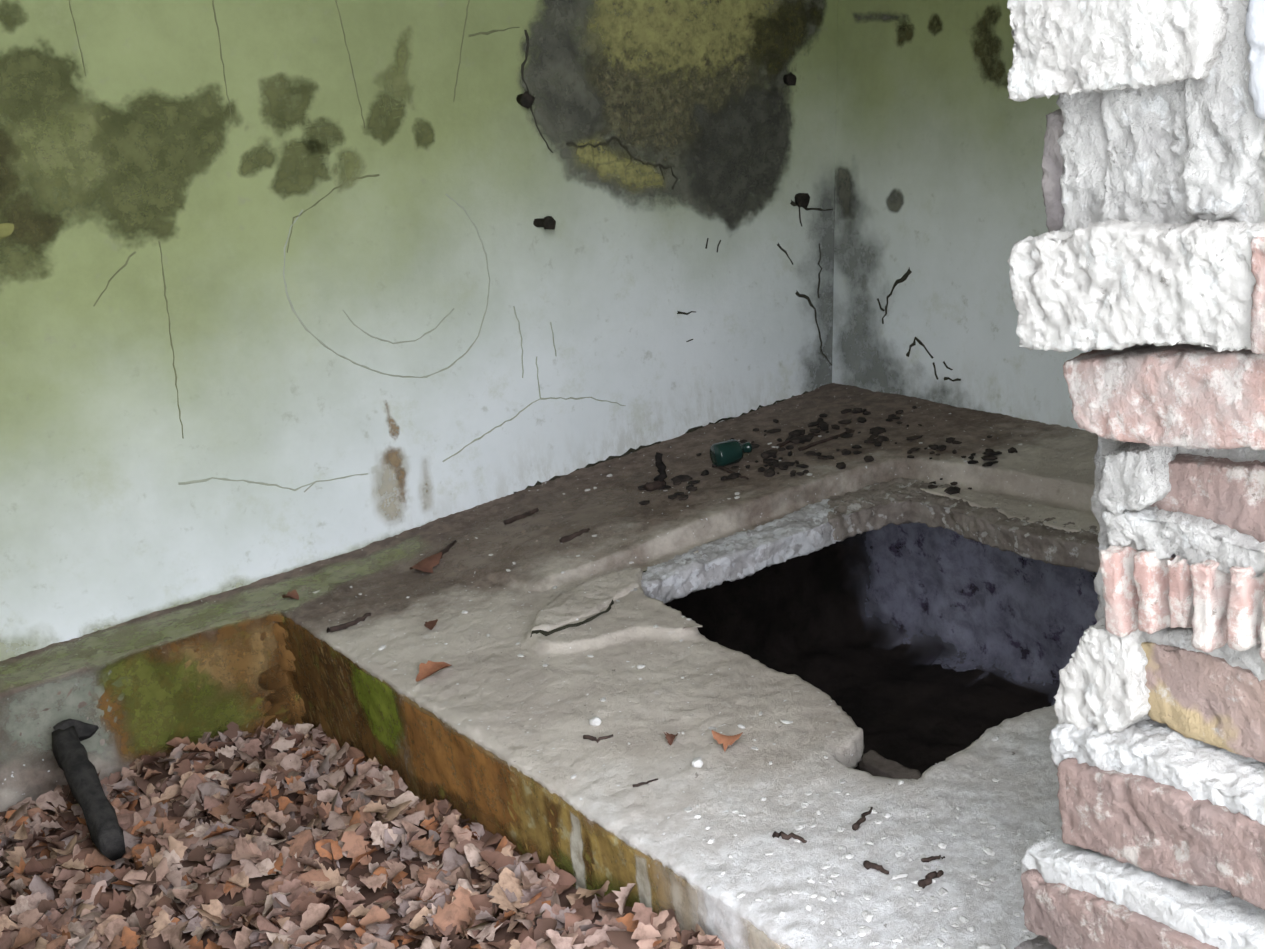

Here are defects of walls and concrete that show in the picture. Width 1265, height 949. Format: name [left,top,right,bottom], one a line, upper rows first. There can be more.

mould [0,1,24,30]
water stain [855,14,913,45]
water stain [928,15,942,34]
mould [0,50,238,279]
mould [240,74,360,196]
mould [367,35,410,143]
mould [415,120,434,147]
water stain [520,0,825,229]
water stain [807,168,905,396]
crack [530,600,614,637]